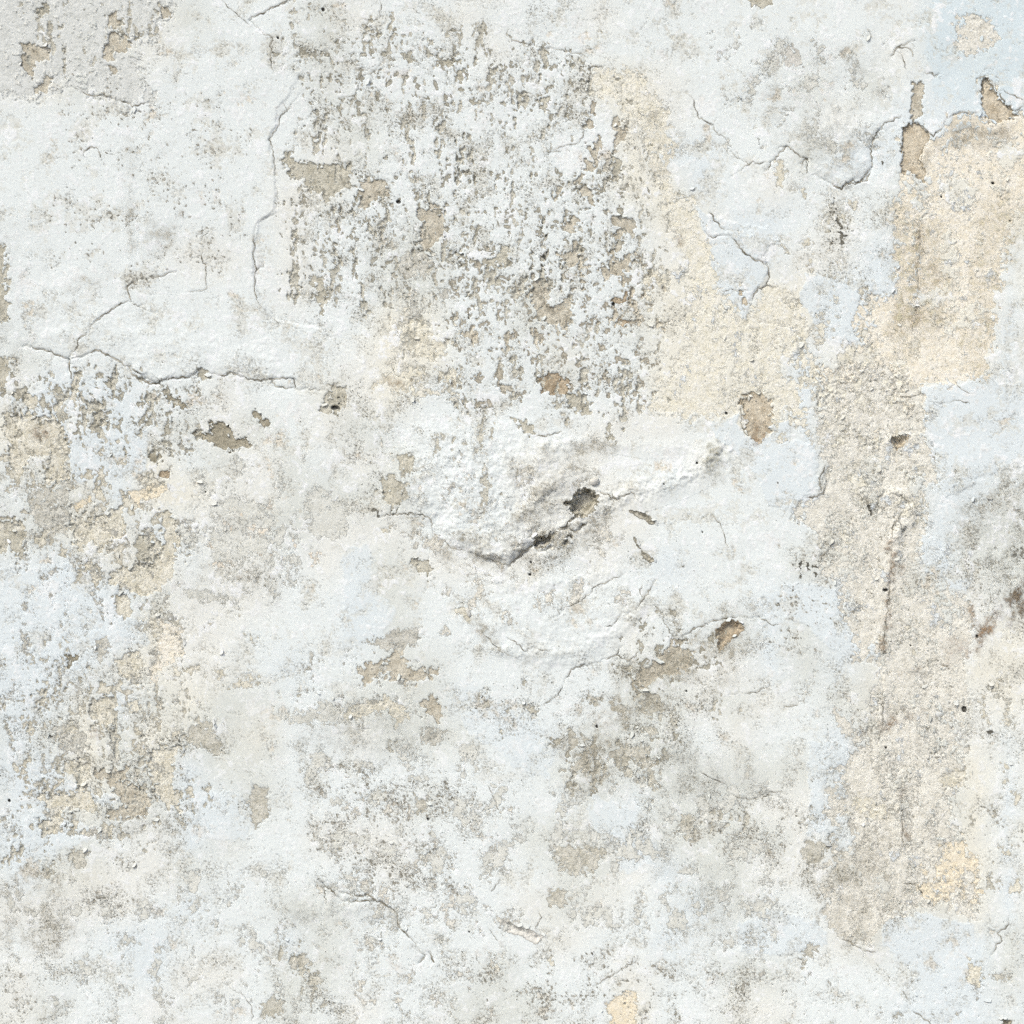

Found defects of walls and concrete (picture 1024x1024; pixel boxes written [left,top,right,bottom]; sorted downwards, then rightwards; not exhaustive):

crack [79,87,147,107]
crack [691,75,1024,190]
crack [893,41,938,76]
crack [32,233,320,391]
crack [252,106,291,322]
crack [707,213,774,300]
crack [912,217,929,328]
peeling [272,0,1024,948]
peeling [0,356,353,884]
crack [546,575,776,703]
peeling [213,607,787,1024]
peeling [5,869,221,1024]